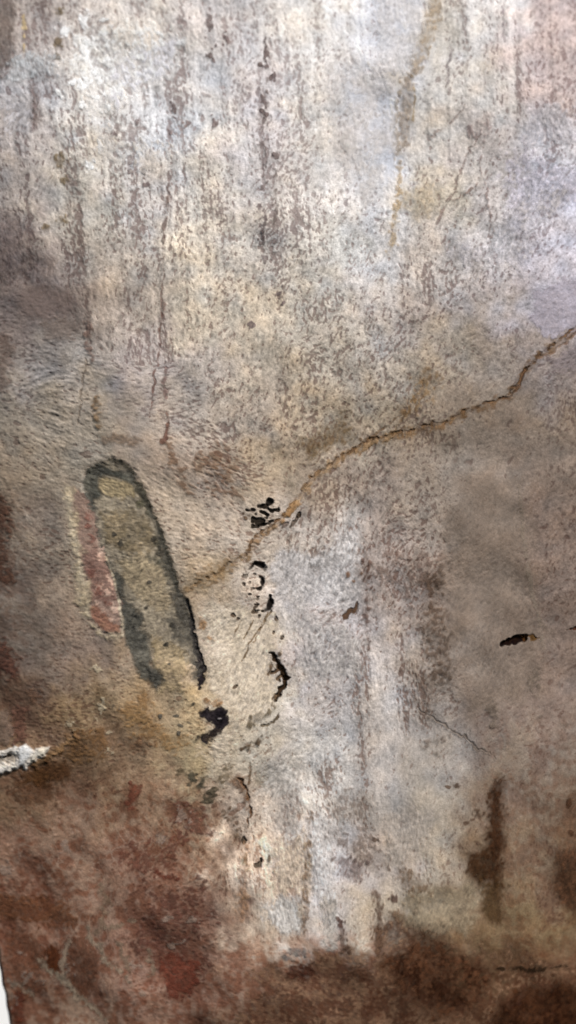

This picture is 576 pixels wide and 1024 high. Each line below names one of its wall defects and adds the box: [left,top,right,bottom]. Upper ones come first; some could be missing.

crack [246,329,573,556]
spalling [243,498,301,528]
spalling [250,562,284,640]
spalling [500,634,537,647]